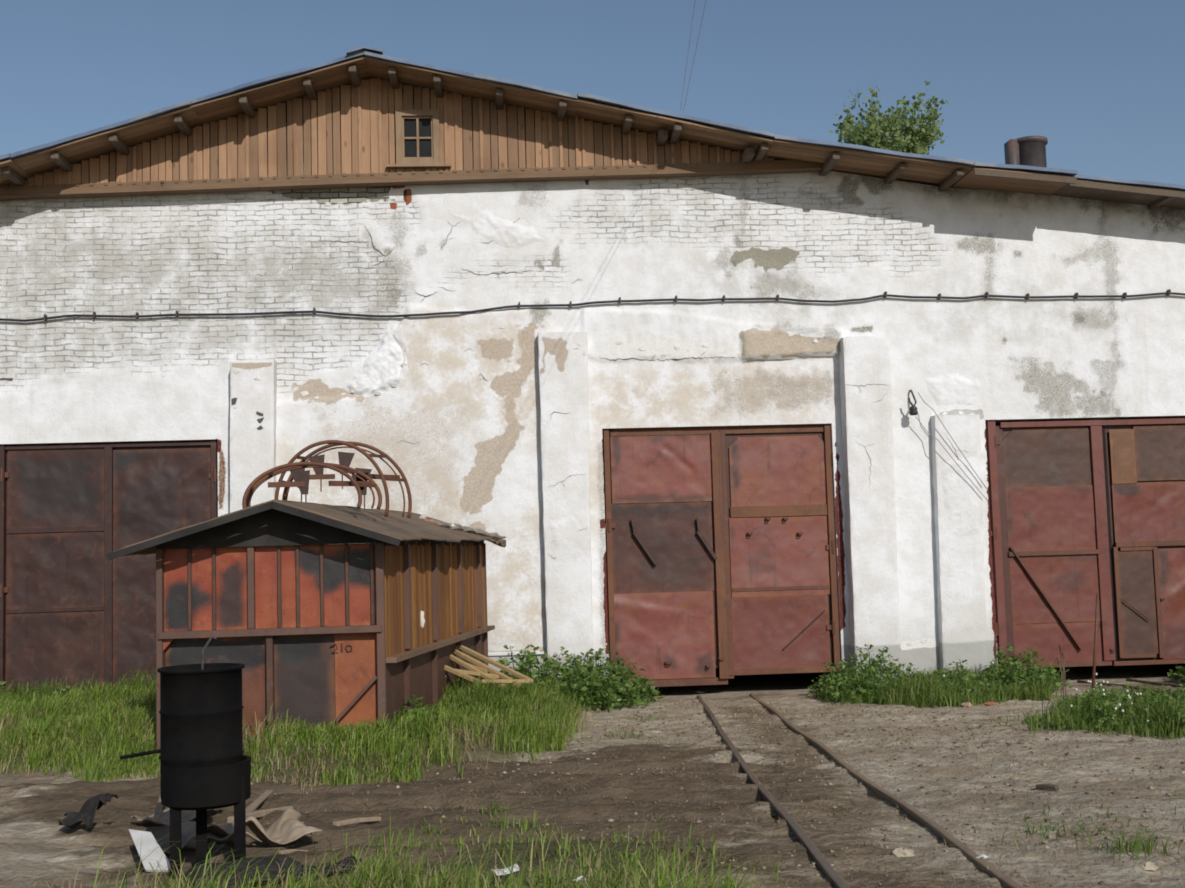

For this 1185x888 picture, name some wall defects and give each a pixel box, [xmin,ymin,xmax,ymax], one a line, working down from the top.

peeling [291,322,587,530]
crack [417,269,530,302]
spalling [604,327,840,425]
leakage [996,208,1140,418]